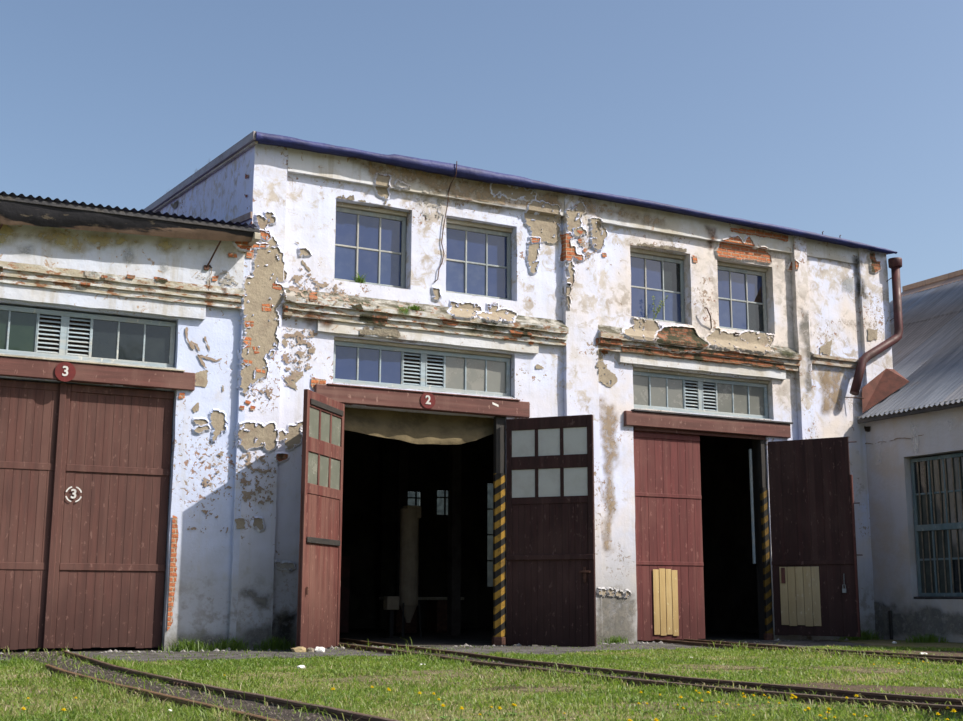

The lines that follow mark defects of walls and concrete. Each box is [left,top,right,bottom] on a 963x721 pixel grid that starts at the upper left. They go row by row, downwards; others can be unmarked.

peeling [430,286,534,345]
peeling [490,183,608,319]
flaking render [714,228,788,265]
peeling [167,210,401,631]